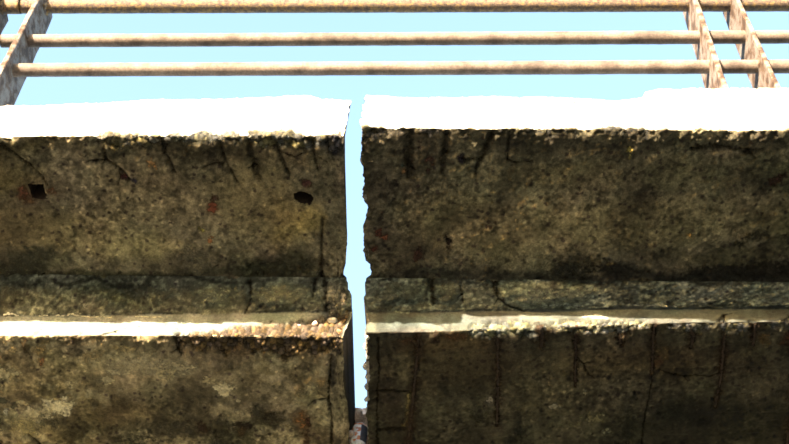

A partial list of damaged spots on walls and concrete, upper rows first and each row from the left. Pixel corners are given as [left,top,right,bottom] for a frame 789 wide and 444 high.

crack [84,132,130,184]
crack [161,136,176,172]
crack [202,138,260,181]
crack [277,144,321,174]
crack [405,130,417,178]
crack [440,130,532,175]
damp [547,249,632,278]
crack [492,281,524,312]
spalling [177,293,350,362]
rust [392,330,467,346]
peeling [82,345,197,386]
peeling [202,376,250,415]